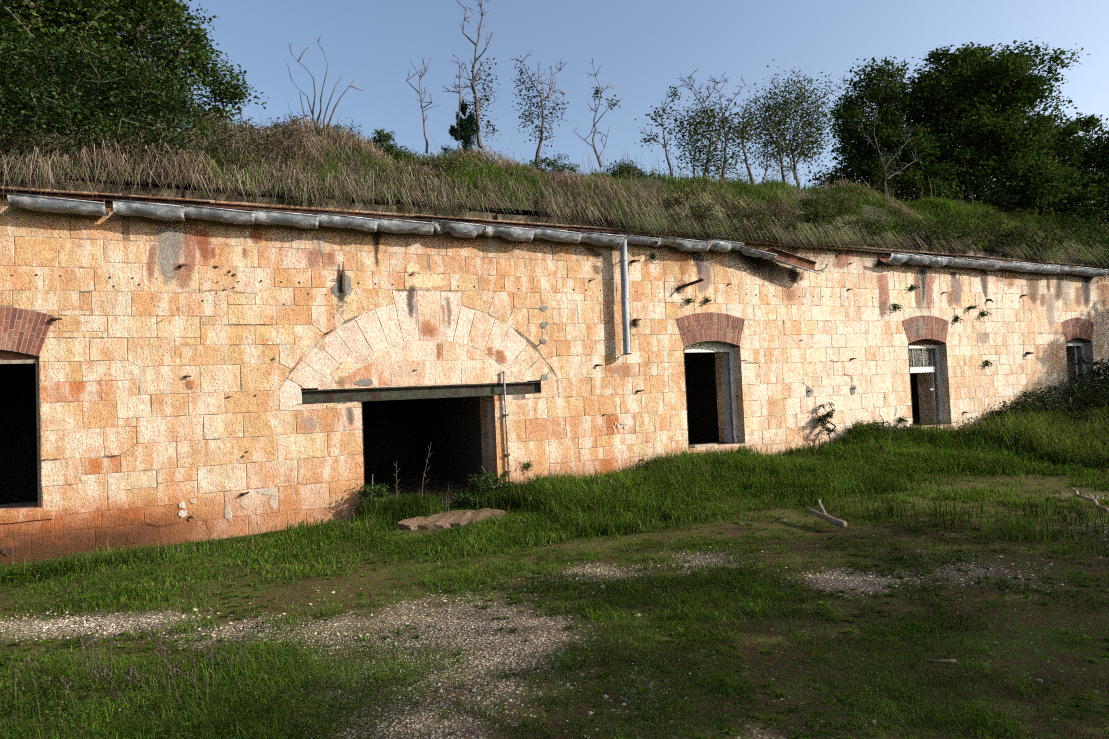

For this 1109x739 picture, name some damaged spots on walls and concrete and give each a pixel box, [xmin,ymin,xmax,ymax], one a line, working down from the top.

leakage [148,225,197,288]
rust [197,229,215,260]
leakage [874,259,889,316]
leakage [916,269,934,335]
leakage [951,272,961,302]